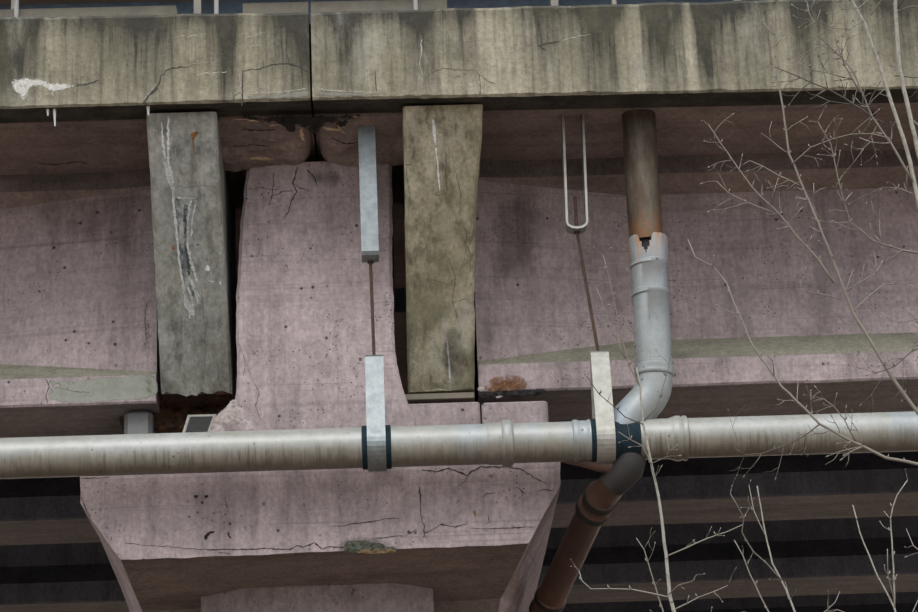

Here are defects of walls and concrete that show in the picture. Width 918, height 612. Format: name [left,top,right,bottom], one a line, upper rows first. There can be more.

efflorescence [12,78,98,99]
crack [143,34,310,105]
crack [247,167,318,218]
water stain [155,116,201,363]
spalling [152,394,253,433]
crack [129,466,554,554]